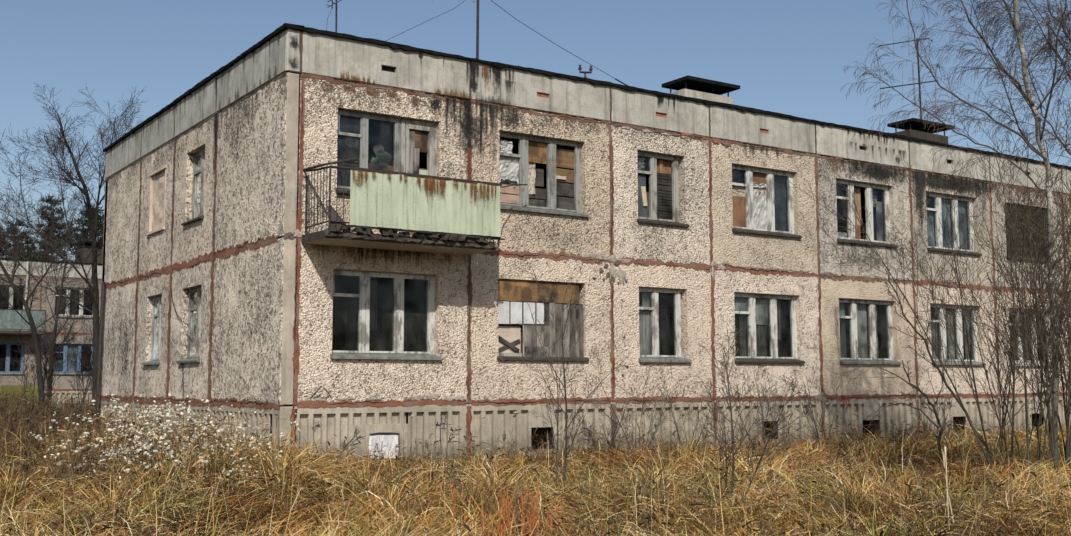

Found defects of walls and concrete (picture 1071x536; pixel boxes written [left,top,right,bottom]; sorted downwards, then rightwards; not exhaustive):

leakage [430,62,522,156]
rust [353,148,497,200]
leakage [832,141,1043,227]
spalling [580,252,631,285]